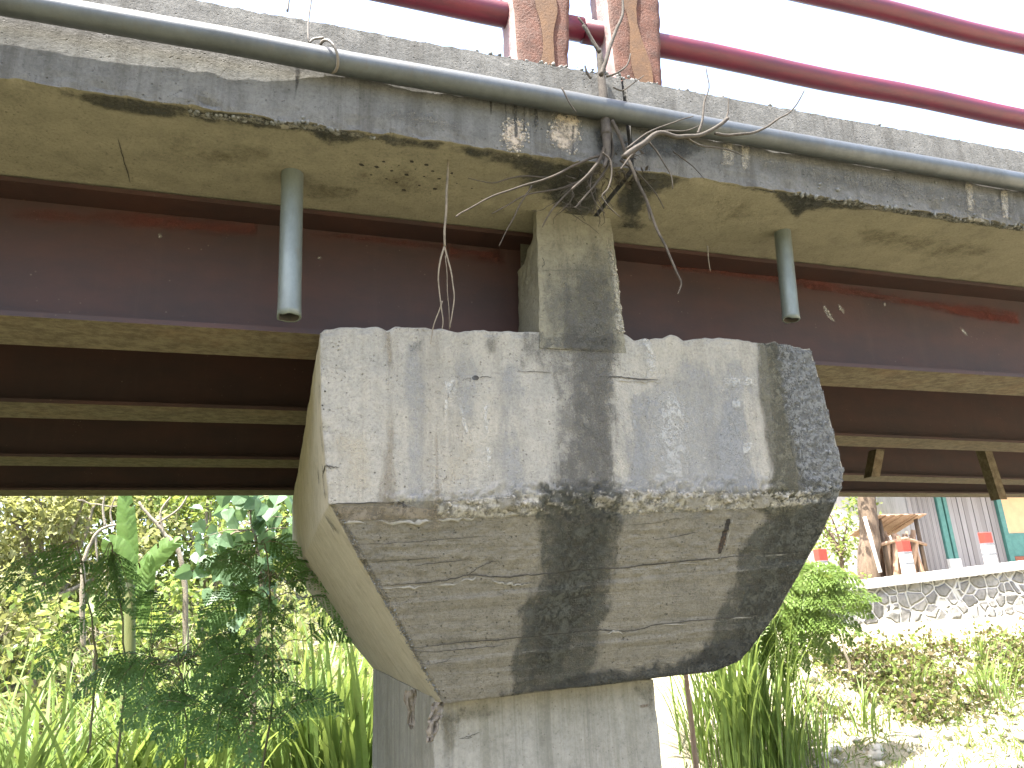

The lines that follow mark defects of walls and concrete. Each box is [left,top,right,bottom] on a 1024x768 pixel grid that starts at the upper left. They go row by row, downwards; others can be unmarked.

water stain [71,94,274,128]
water stain [290,123,360,143]
water stain [378,134,443,149]
spalling [499,104,583,159]
water stain [464,129,701,215]
water stain [615,172,676,228]
water stain [502,251,837,697]
spalling [326,427,822,695]
crack [380,517,803,590]
crack [410,612,769,664]